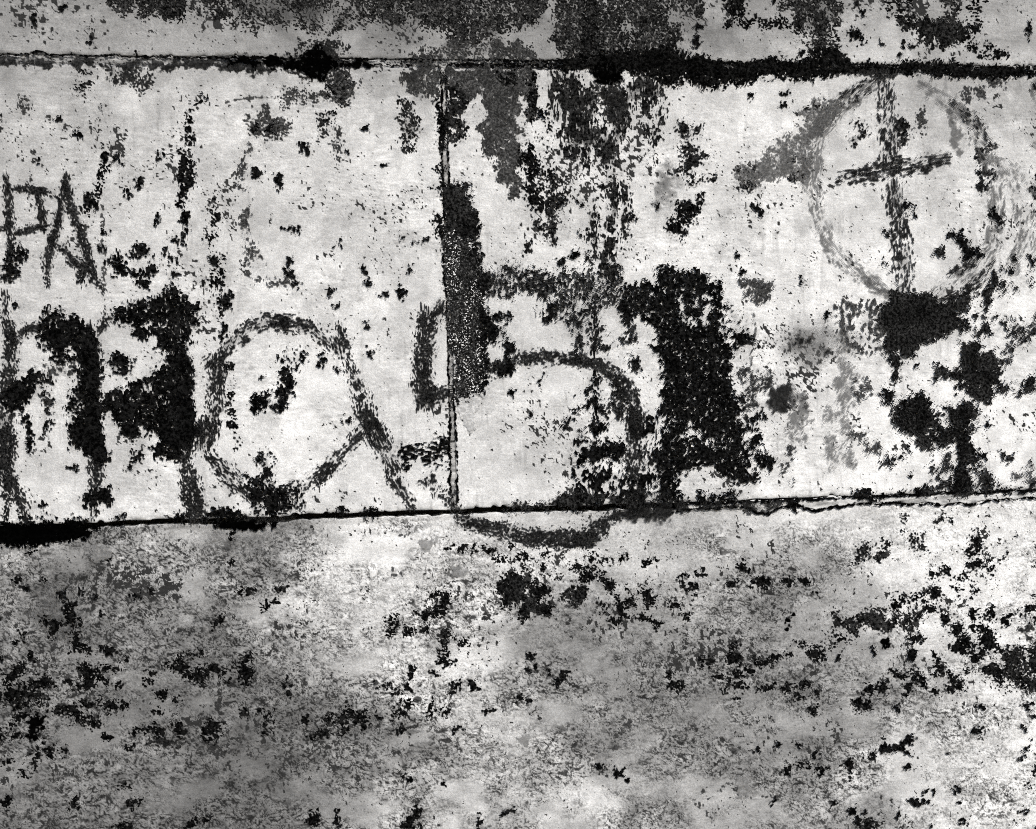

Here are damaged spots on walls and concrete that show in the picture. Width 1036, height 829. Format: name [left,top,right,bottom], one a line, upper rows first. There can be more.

leakage [439,62,679,279]
leakage [832,63,905,79]